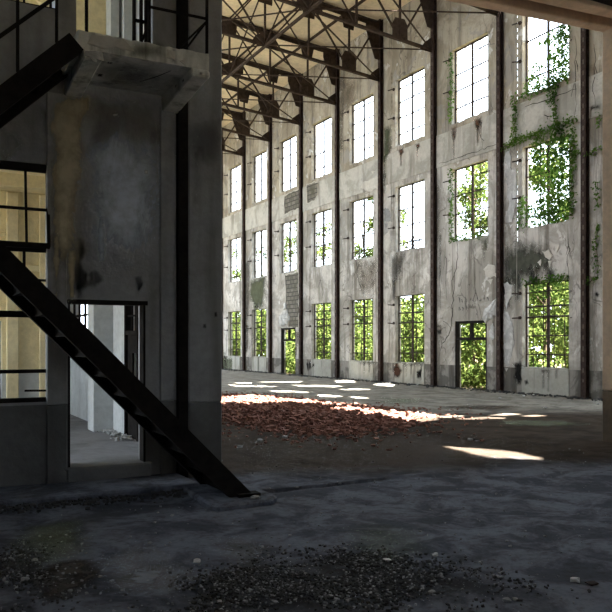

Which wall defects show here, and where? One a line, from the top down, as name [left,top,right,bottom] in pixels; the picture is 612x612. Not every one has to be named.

leakage [51,98,89,298]
flaking render [284,181,319,216]
flaking render [284,271,299,328]
crack [439,244,458,355]
flaking render [484,265,496,284]
flaking render [482,282,528,384]